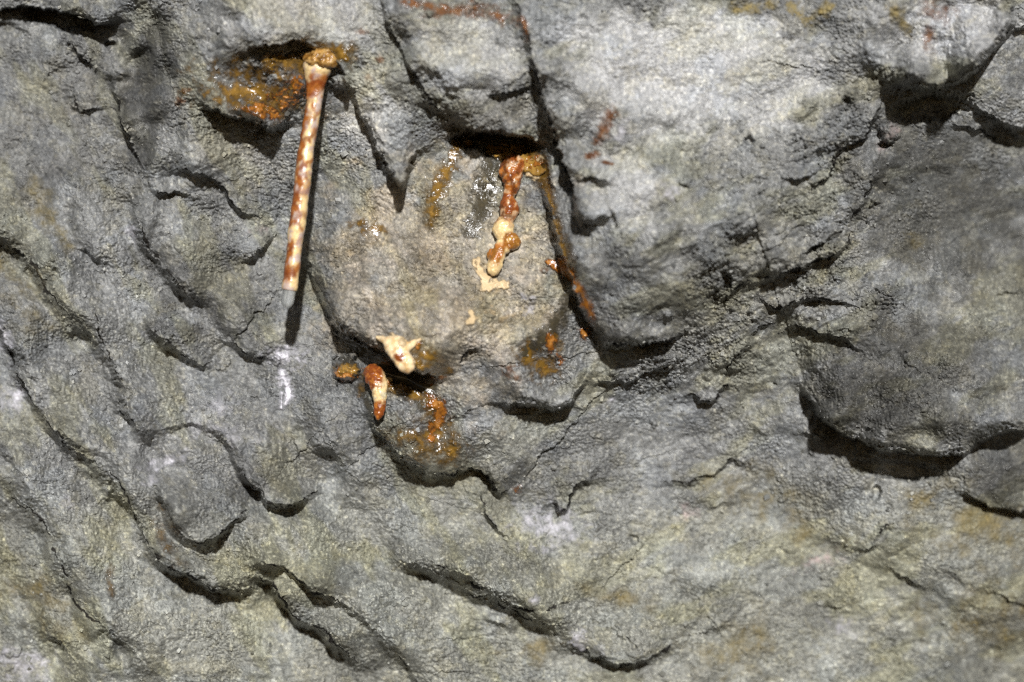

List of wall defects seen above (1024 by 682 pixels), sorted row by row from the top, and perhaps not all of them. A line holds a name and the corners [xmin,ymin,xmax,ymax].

corrosion [177,52,306,126]
corrosion [538,175,596,339]
corrosion [396,342,461,466]
corrosion [507,332,563,380]